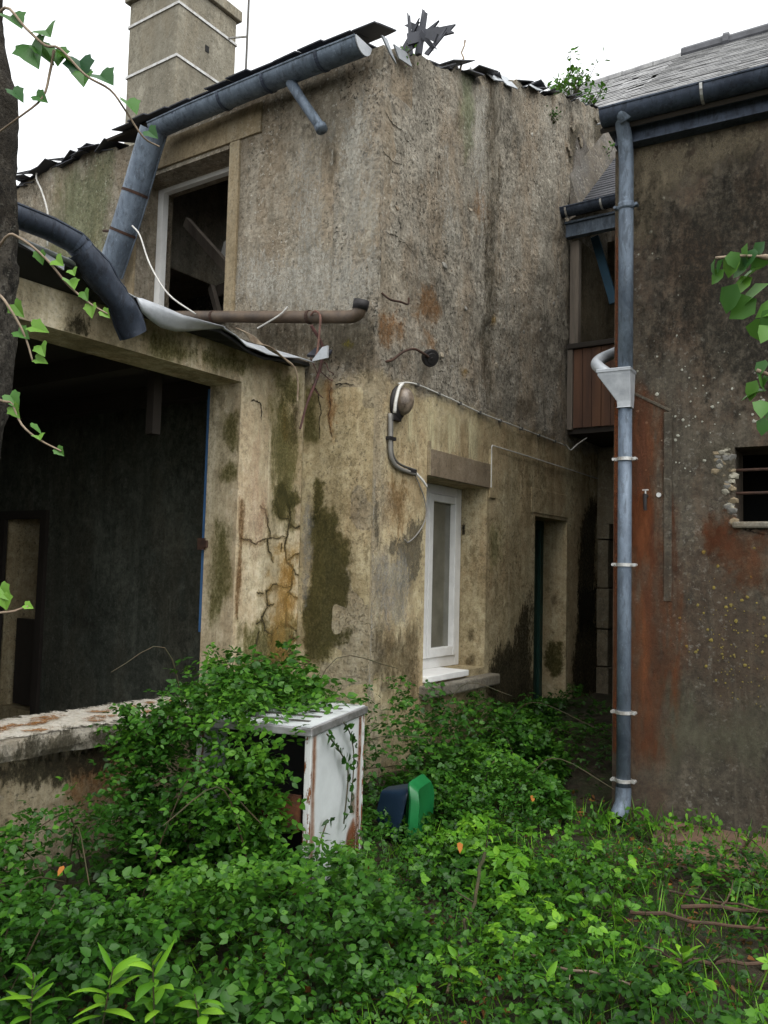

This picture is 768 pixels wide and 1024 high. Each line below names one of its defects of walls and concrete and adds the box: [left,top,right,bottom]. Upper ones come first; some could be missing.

damp [272,378,316,516]
corrosion [632,404,653,553]
crack [240,488,300,655]
damp [244,480,350,684]
damp [489,590,534,708]
damp [546,498,597,699]